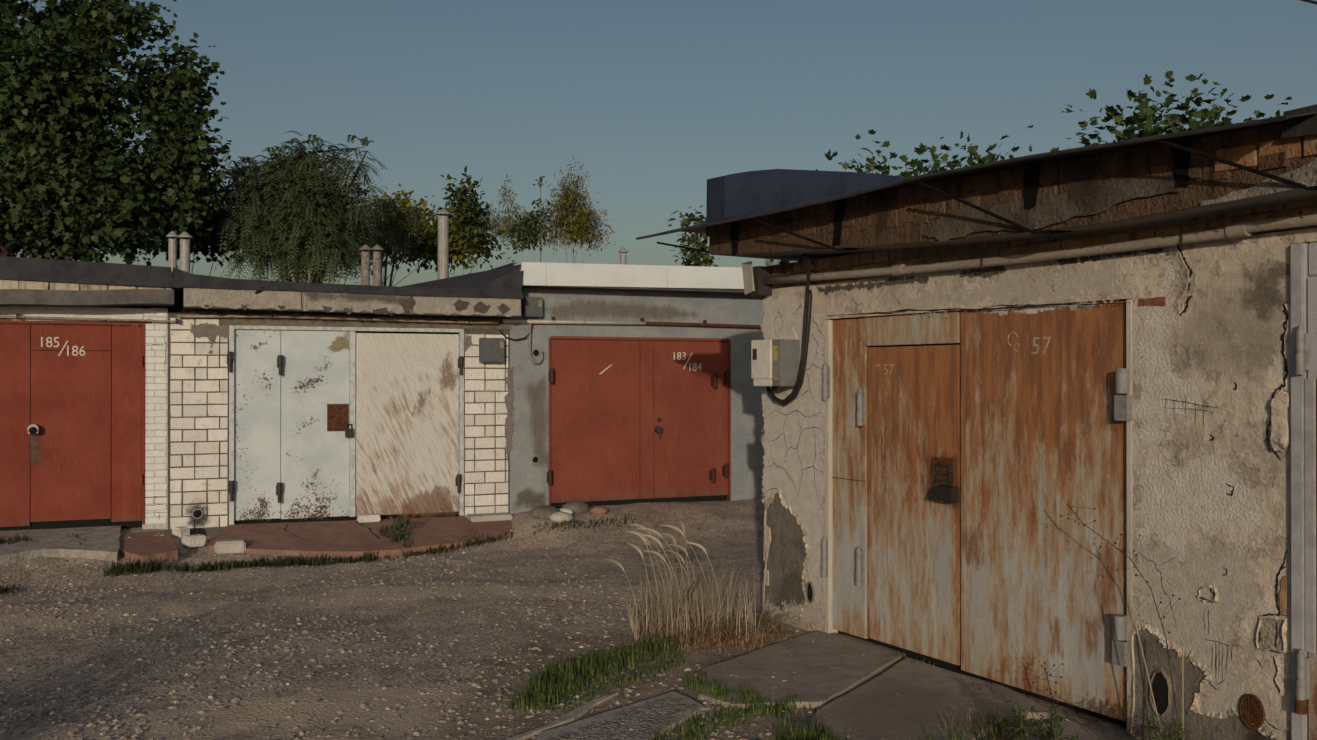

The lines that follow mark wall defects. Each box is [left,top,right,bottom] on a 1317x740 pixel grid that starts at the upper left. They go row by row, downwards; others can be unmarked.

crack [1170,245,1192,316]
peeling [253,492,328,523]
peeling [293,357,332,395]
peeling [760,291,829,622]
crack [767,279,1130,497]
peeling [891,257,1291,740]
crack [1164,381,1237,441]
crack [1266,301,1291,460]
rust [1087,545,1116,649]